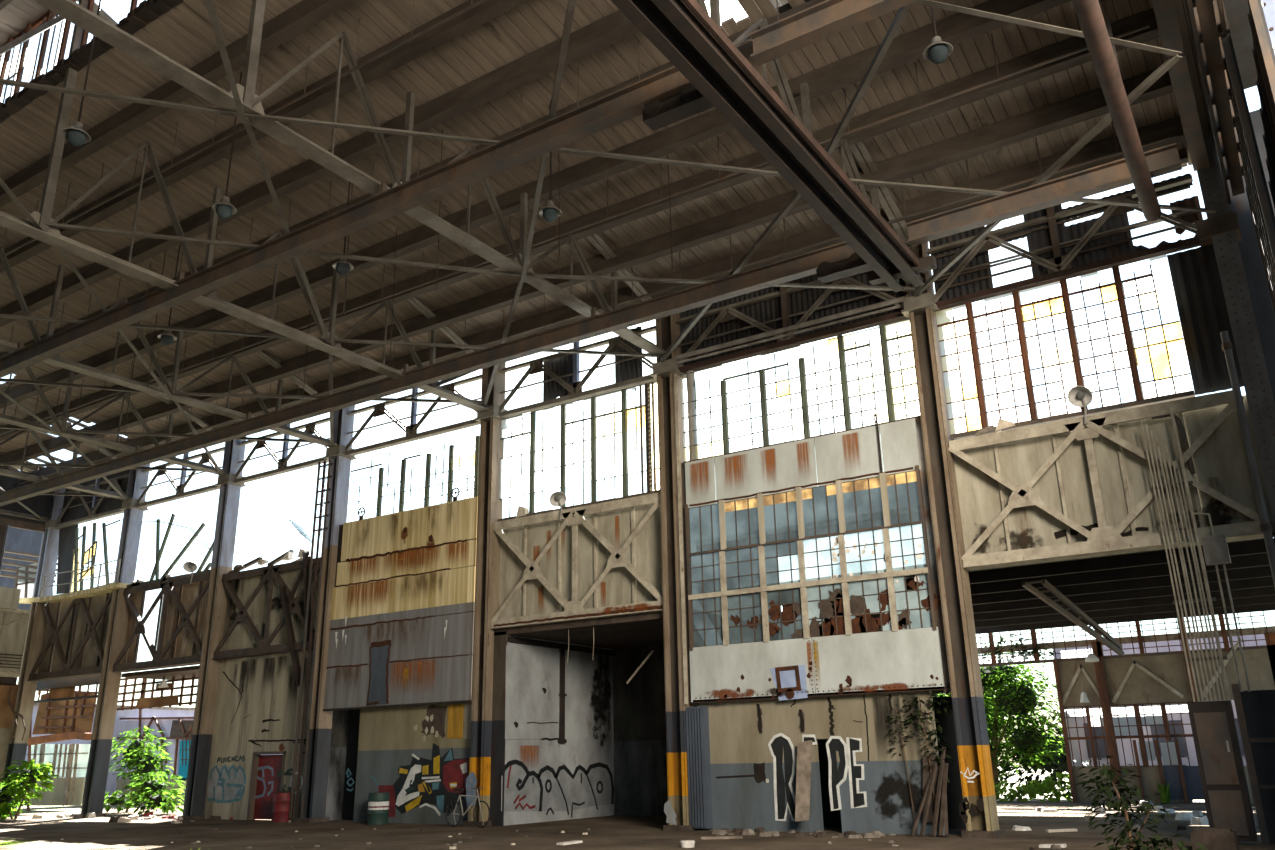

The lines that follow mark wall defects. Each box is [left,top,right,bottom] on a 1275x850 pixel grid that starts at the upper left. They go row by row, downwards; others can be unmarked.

corrosion [691,462,708,485]
corrosion [725,455,743,478]
corrosion [765,449,775,472]
corrosion [797,442,808,466]
corrosion [843,433,858,456]
corrosion [689,467,913,506]
corrosion [335,527,467,602]
corrosion [326,616,468,706]
leakage [235,656,306,694]